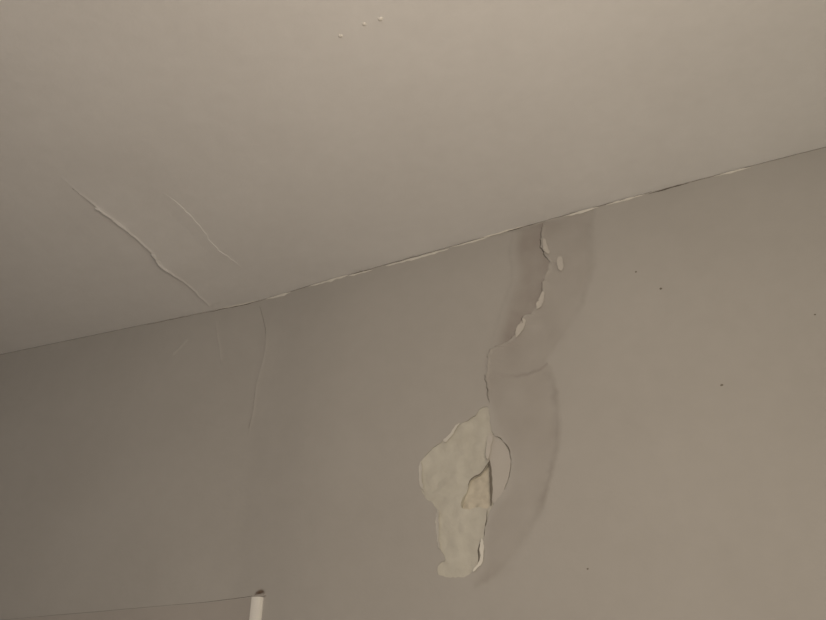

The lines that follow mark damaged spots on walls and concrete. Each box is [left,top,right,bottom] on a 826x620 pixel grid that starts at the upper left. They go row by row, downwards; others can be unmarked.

crack [556,147,825,218]
crack [0,223,536,355]
spalling [419,407,511,578]